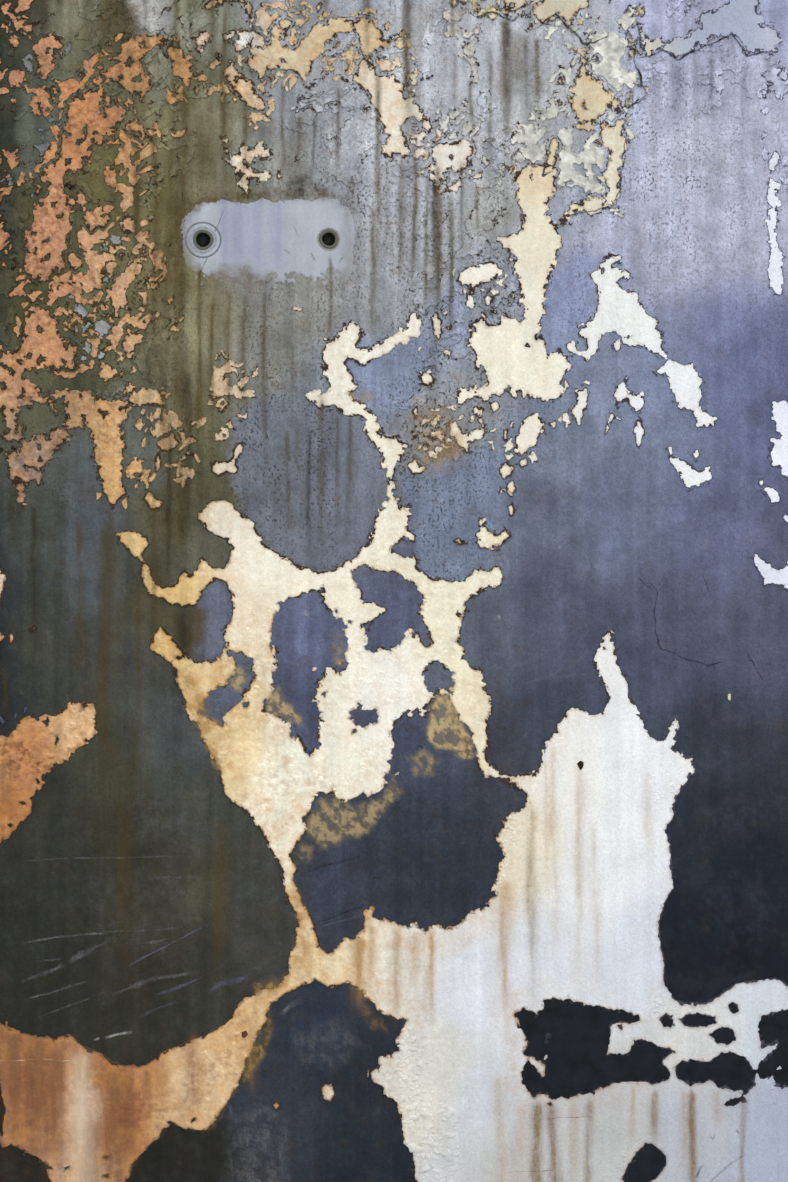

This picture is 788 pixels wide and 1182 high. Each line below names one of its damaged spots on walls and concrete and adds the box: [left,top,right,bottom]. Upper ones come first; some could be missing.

peeling [0,0,788,511]
damp [400,172,453,280]
corrosion [267,692,300,722]
peeling [0,312,788,1182]
corrosion [532,1106,556,1182]